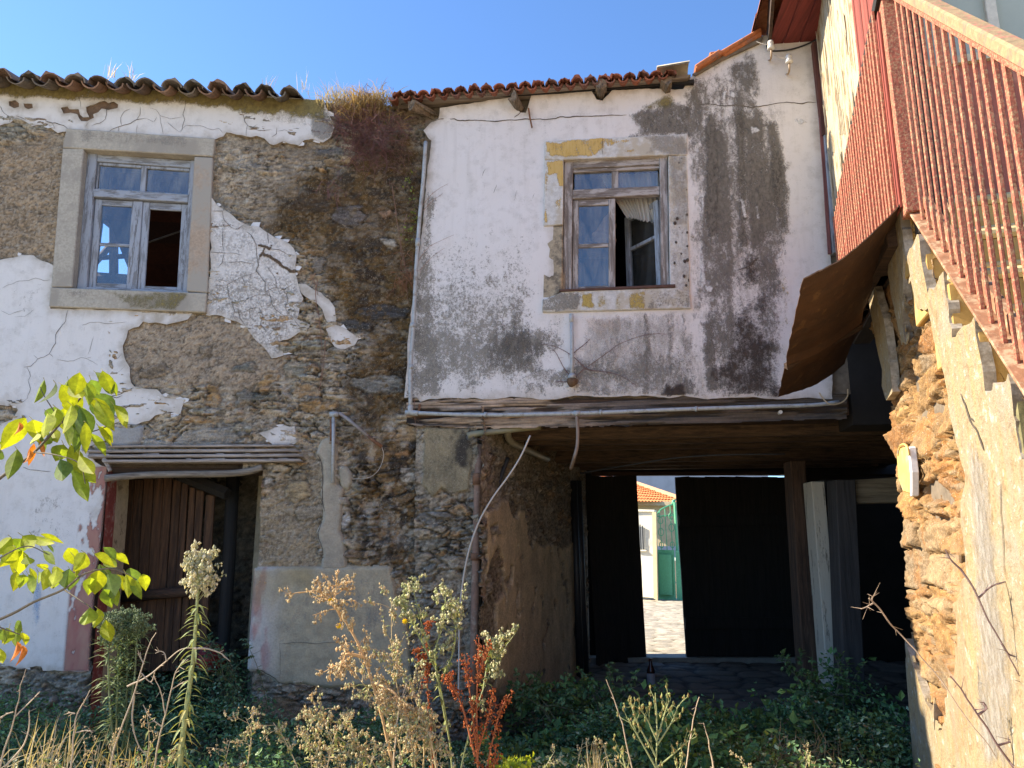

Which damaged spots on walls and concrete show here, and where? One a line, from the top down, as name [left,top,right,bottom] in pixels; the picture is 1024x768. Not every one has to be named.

crack [1,99,283,135]
crack [433,99,623,154]
peeling [0,101,118,265]
peeling [545,138,634,190]
water stain [629,55,789,397]
crack [214,211,300,337]
water stain [543,292,581,312]
crack [27,311,123,394]
water stain [488,311,549,370]
peeling [0,399,25,425]
peeling [81,103,591,743]